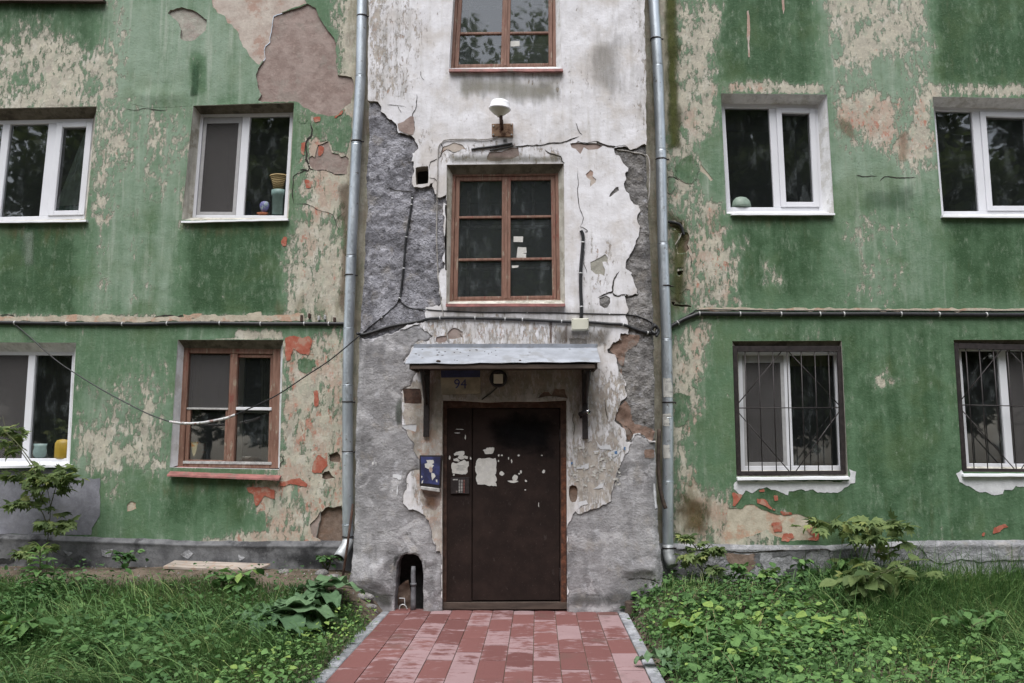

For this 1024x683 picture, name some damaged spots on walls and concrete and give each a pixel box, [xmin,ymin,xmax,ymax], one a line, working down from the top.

flaking render [169,8,207,41]
peeling [212,0,354,188]
peeling [398,116,415,135]
crack [515,124,628,272]
peeling [298,357,316,374]
flaking render [609,334,640,374]
flaking render [615,401,655,459]
peeling [279,452,341,487]
peeling [423,489,441,510]
hole [569,485,577,502]
flaking render [310,506,343,541]
peeling [723,489,825,582]